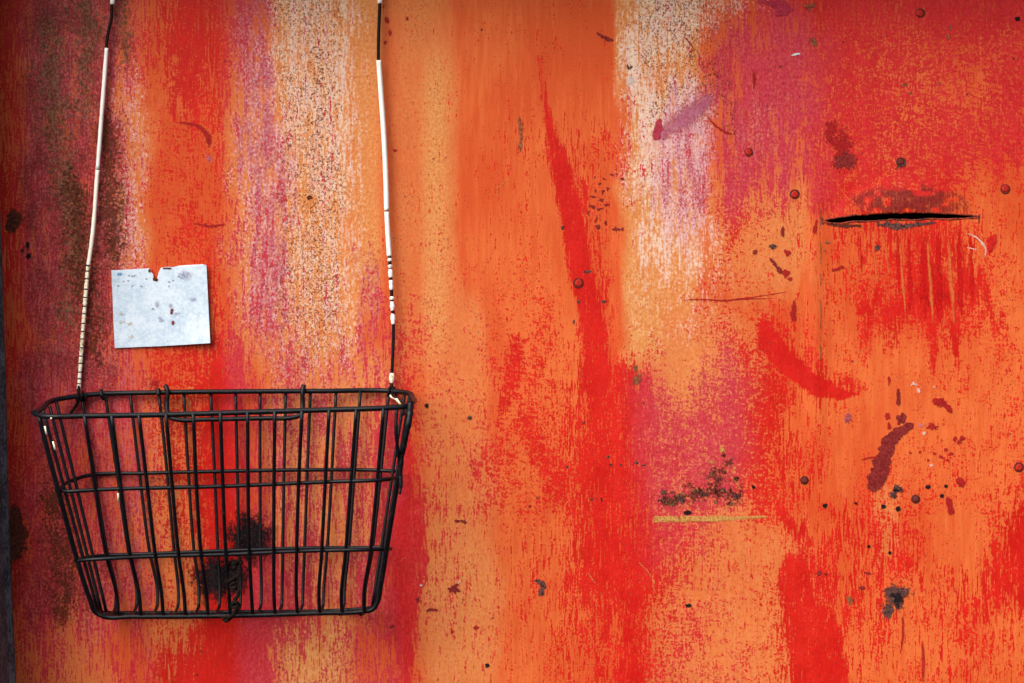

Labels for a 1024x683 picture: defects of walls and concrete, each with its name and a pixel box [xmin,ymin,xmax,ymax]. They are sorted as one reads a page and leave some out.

corrosion [657,447,743,509]
corrosion [881,584,913,650]